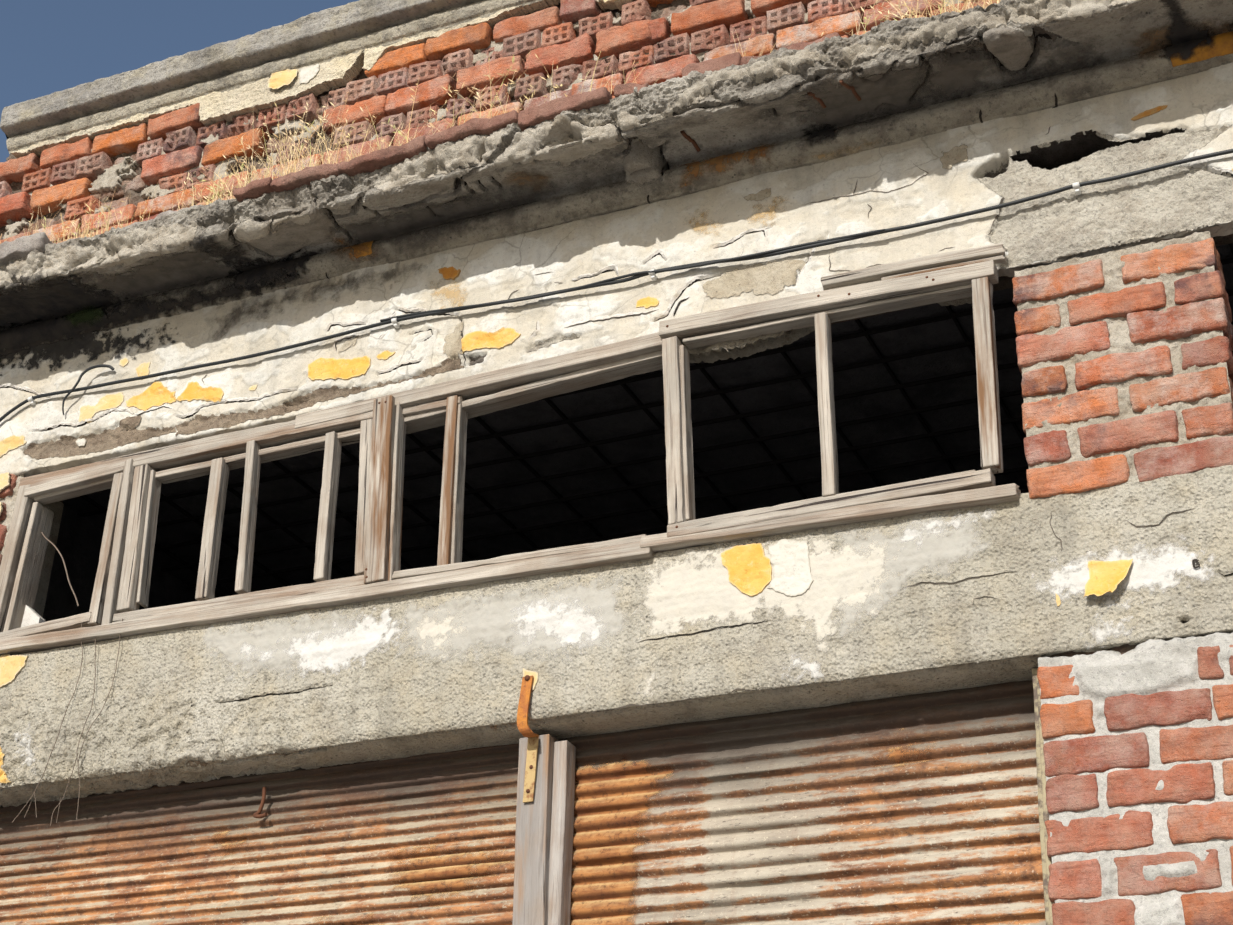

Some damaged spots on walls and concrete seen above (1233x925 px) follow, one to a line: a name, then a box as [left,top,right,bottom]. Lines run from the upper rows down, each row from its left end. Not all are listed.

water stain [1137,0,1233,61]
spalling [373,114,670,192]
spalling [975,105,1233,269]
spalling [0,221,198,290]
water stain [0,235,365,376]
crack [325,307,466,376]
crack [508,225,773,340]
spalling [0,321,521,460]
crack [215,682,332,703]
corrosion [213,830,245,854]
corrosion [393,845,510,905]
corrosion [570,757,673,925]